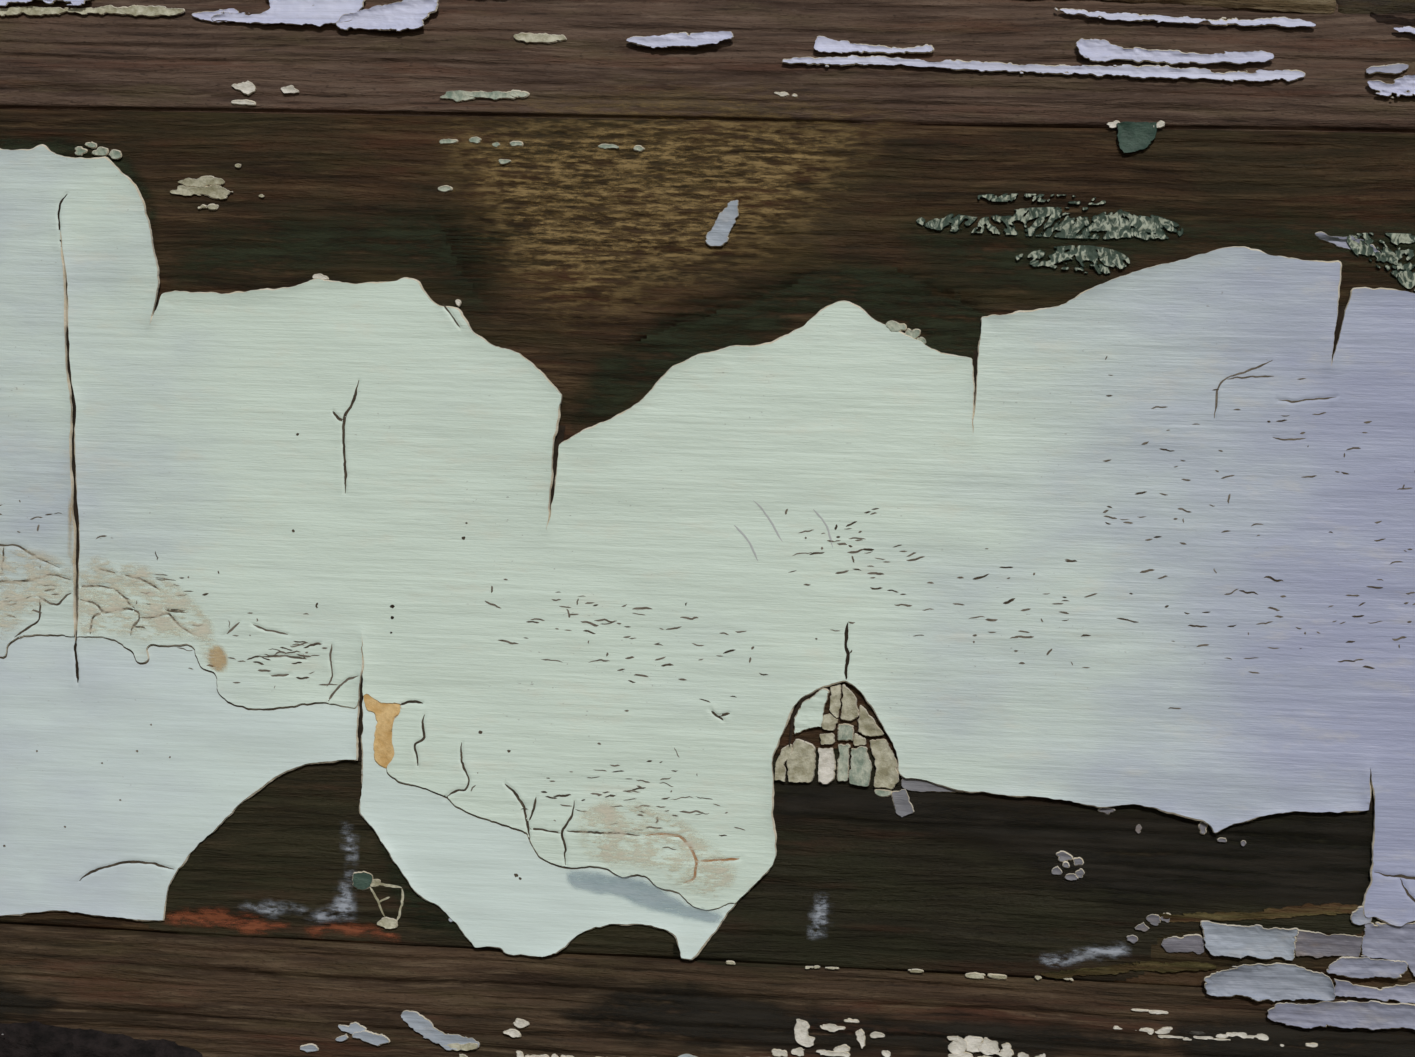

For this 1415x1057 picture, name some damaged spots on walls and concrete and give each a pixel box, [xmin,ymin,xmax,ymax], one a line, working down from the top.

peeling [0,0,439,32]
peeling [626,31,734,49]
peeling [782,36,1305,82]
peeling [1055,8,1316,28]
crack [58,194,67,241]
water stain [913,221,1415,287]
crack [785,305,1415,679]
crack [0,280,768,911]
peeling [143,694,492,948]
peeling [558,684,1415,1048]
peeling [771,1018,891,1057]
peeling [947,1035,1046,1057]